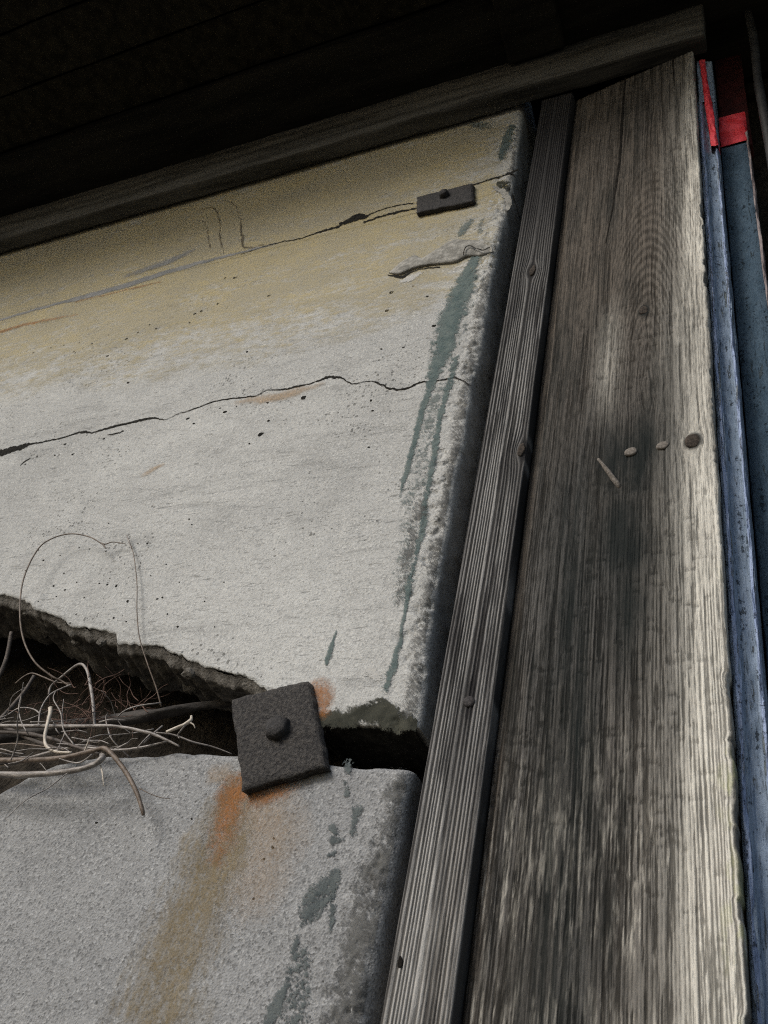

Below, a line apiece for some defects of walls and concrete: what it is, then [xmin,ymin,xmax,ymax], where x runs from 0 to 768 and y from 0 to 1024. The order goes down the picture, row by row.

crack [473,169,519,185]
crack [200,200,416,255]
spalling [388,239,493,294]
crack [0,375,471,463]
damp [0,117,518,718]
spalling [0,595,266,714]
rust [314,682,330,716]
damp [315,771,407,1024]